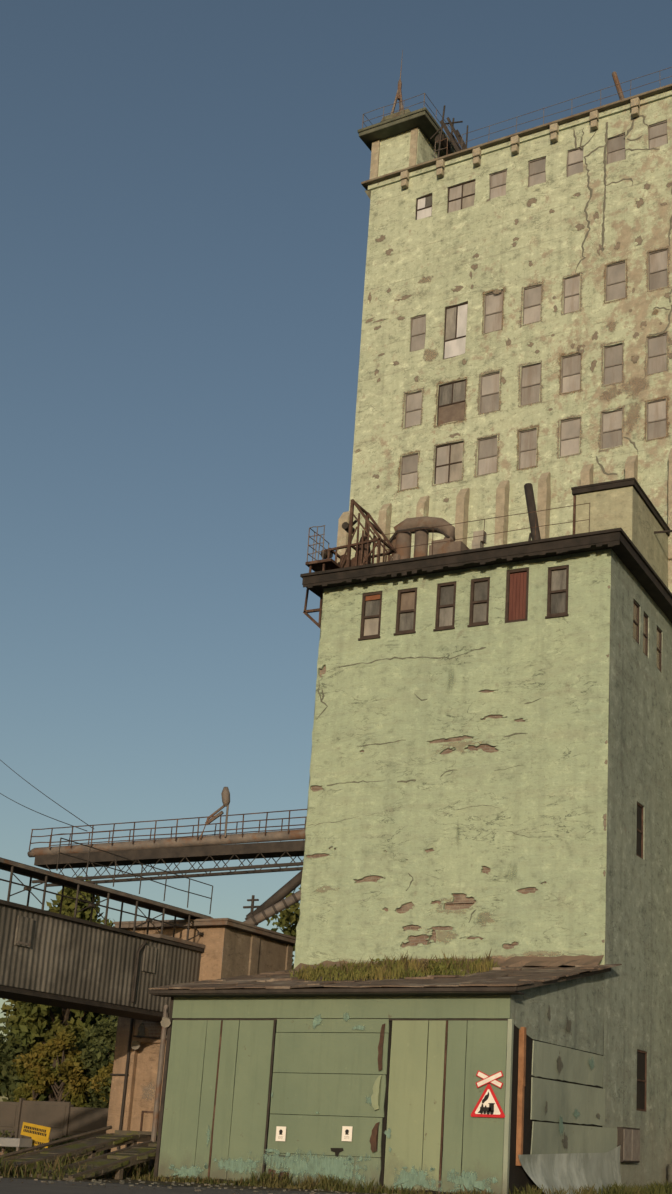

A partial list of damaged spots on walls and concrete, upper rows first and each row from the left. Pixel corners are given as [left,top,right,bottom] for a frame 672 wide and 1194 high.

crack [573,115,658,273]
crack [664,188,672,246]
crack [647,289,672,336]
spalling [427,735,499,754]
spalling [517,880,546,895]
spalling [380,894,494,948]
peeling [169,1149,367,1183]
peeling [385,1166,498,1194]